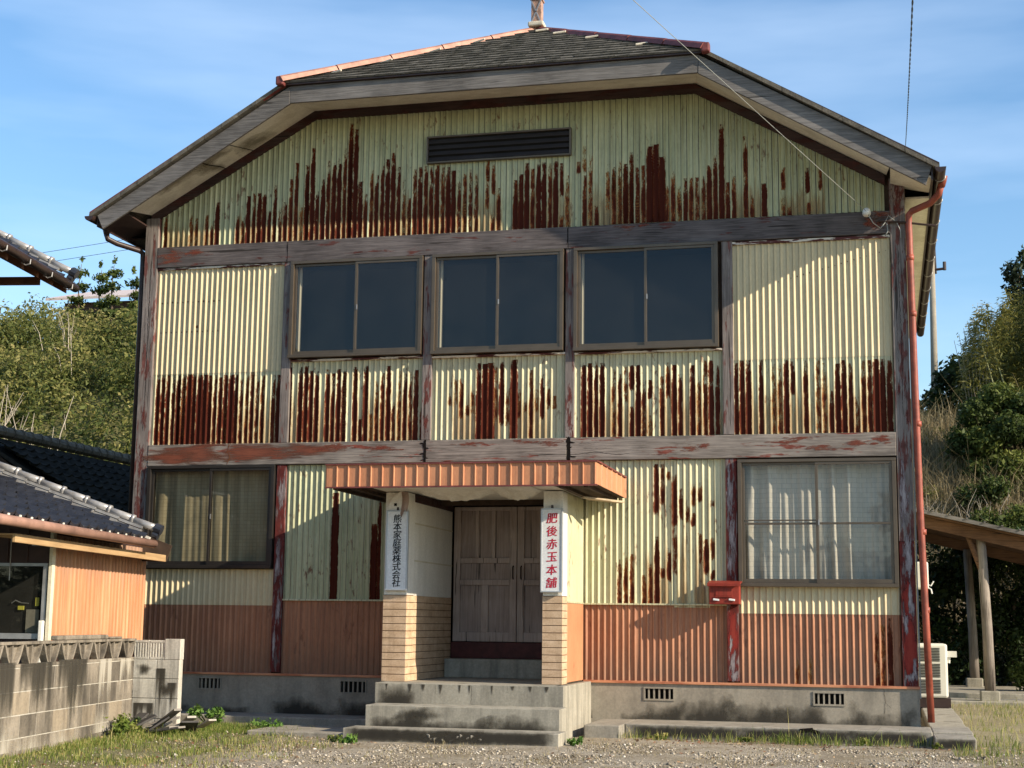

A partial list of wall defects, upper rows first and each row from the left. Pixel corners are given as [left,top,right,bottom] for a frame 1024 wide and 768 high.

rust [235,124,768,244]
rust [153,366,422,445]
rust [448,359,557,439]
rust [580,360,721,437]
rust [734,359,894,435]
peeling [770,435,893,451]
peeling [272,541,281,661]
rust [369,501,382,600]
rust [617,464,715,604]
peeling [726,463,736,575]
peeling [728,606,739,681]
peeling [899,460,919,686]